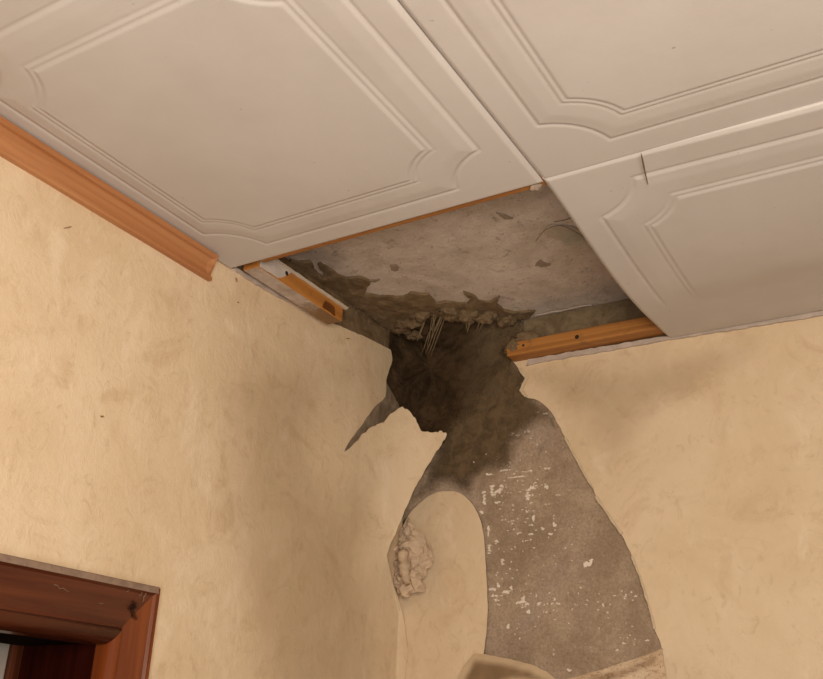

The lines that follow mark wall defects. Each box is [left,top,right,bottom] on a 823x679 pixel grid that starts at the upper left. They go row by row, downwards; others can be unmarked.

peeling [543,224,583,242]
flaking render [278,257,664,679]
water stain [430,361,540,487]